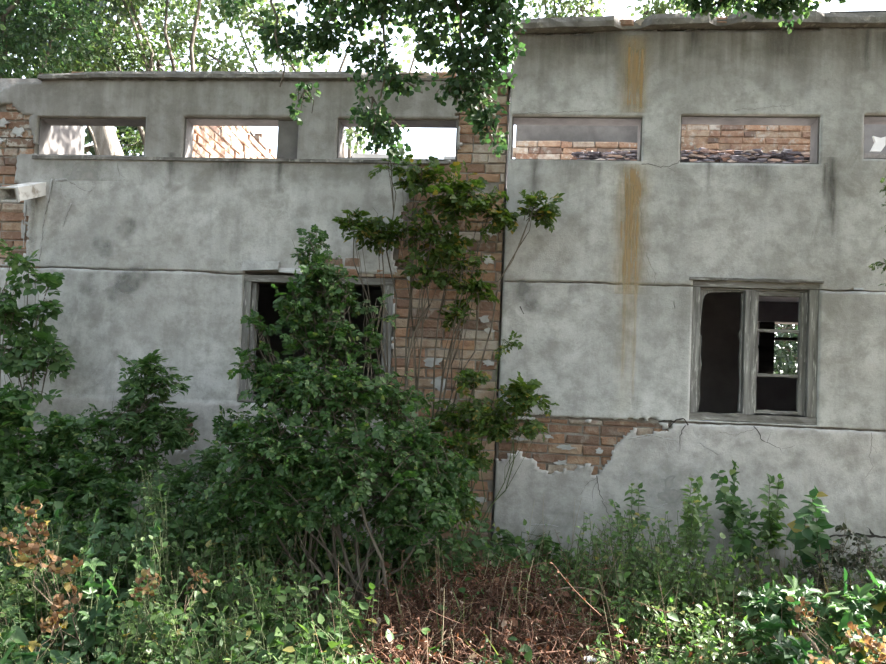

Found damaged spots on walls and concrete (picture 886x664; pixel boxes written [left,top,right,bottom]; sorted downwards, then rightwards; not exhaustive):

flaking render [0,104,35,187]
flaking render [0,160,102,268]
corrosion [620,168,643,290]
flaking render [390,87,676,560]
crack [658,418,689,451]